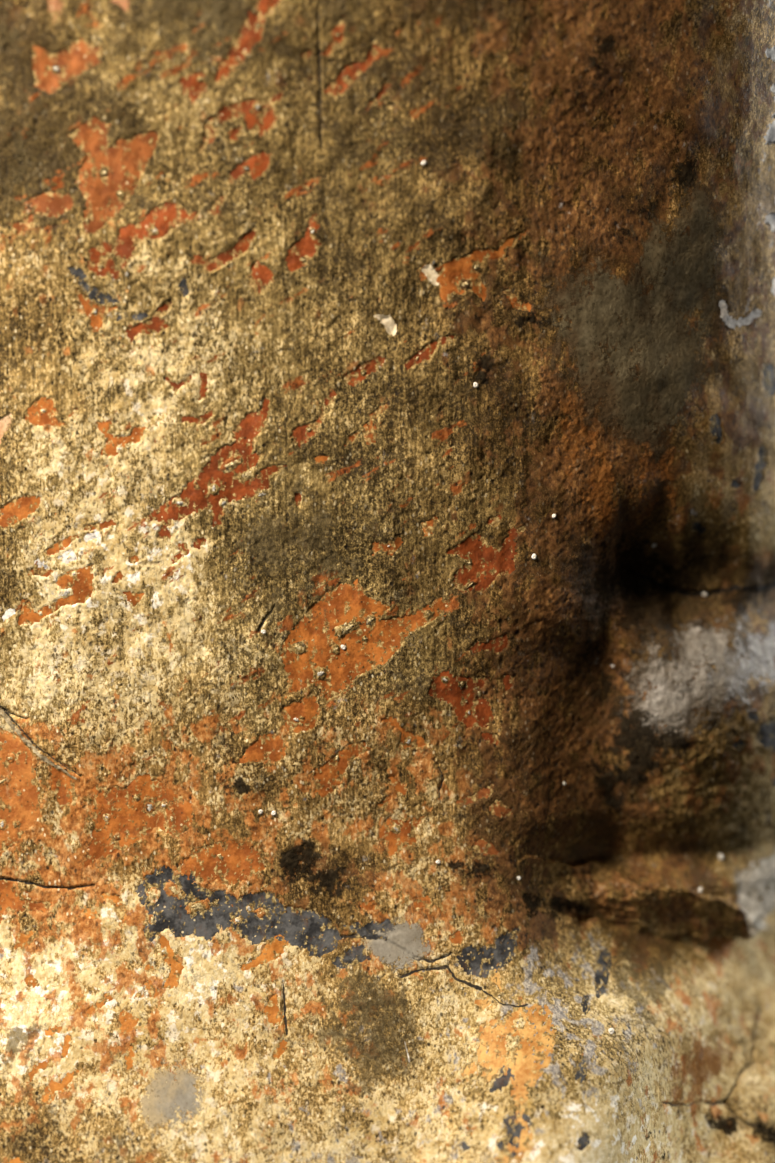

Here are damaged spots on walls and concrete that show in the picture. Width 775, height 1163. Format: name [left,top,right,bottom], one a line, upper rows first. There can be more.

peeling [32,38,103,93]
peeling [13,116,188,280]
leakage [476,354,495,384]
leakage [575,535,775,812]
crack [0,706,81,779]
peeling [0,728,194,868]
crack [0,878,92,890]
peeling [144,936,184,998]
flaking render [332,895,434,973]
leakage [448,860,499,879]
leakage [518,893,591,920]
crack [662,1005,774,1133]